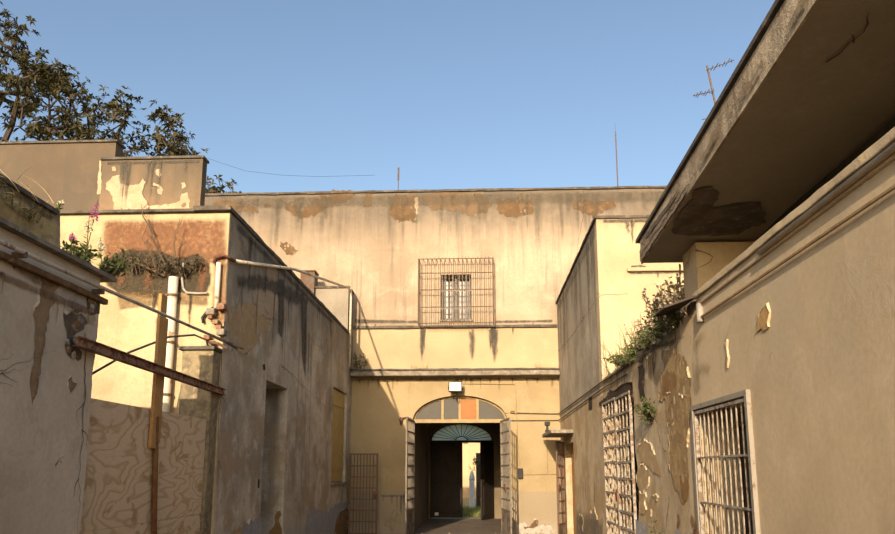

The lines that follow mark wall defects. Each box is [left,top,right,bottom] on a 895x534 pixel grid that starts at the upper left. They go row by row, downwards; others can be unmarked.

crack [826,13,869,62]
peeling [97,160,190,210]
water stain [603,219,647,240]
spalling [672,187,766,236]
peeling [30,278,100,404]
peeling [203,274,278,355]
peeling [756,302,771,333]
peeling [588,346,692,534]